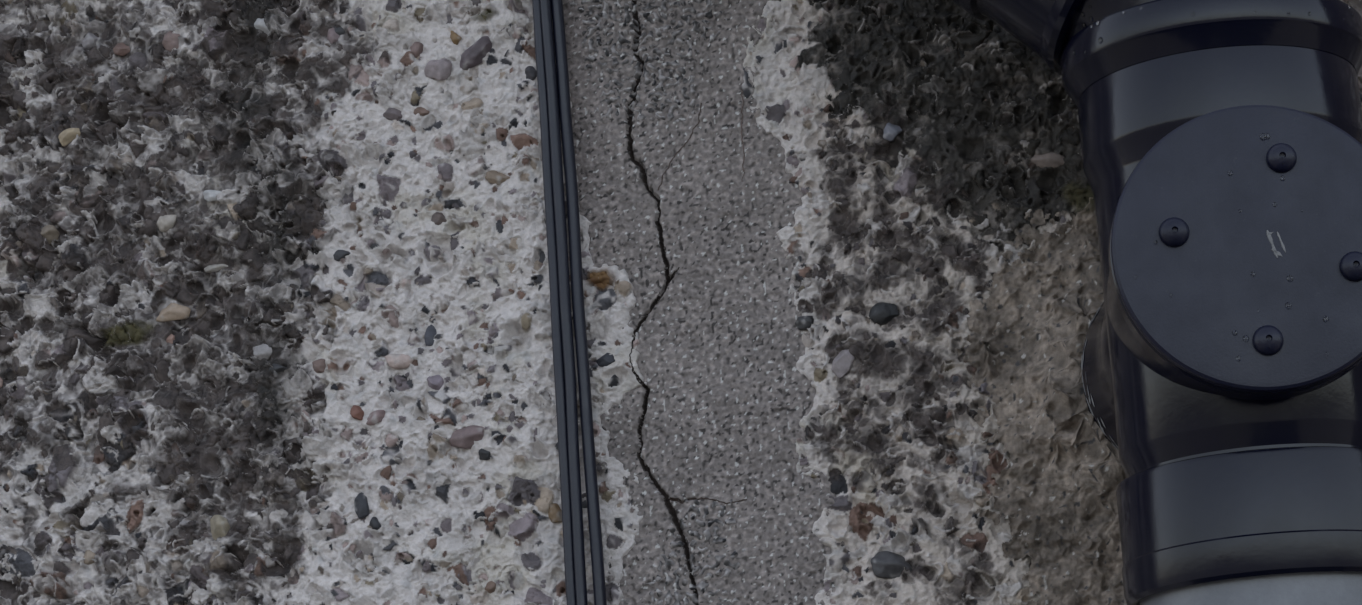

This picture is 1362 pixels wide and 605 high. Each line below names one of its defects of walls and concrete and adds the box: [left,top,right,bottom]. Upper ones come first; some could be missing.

crack [626,0,747,605]